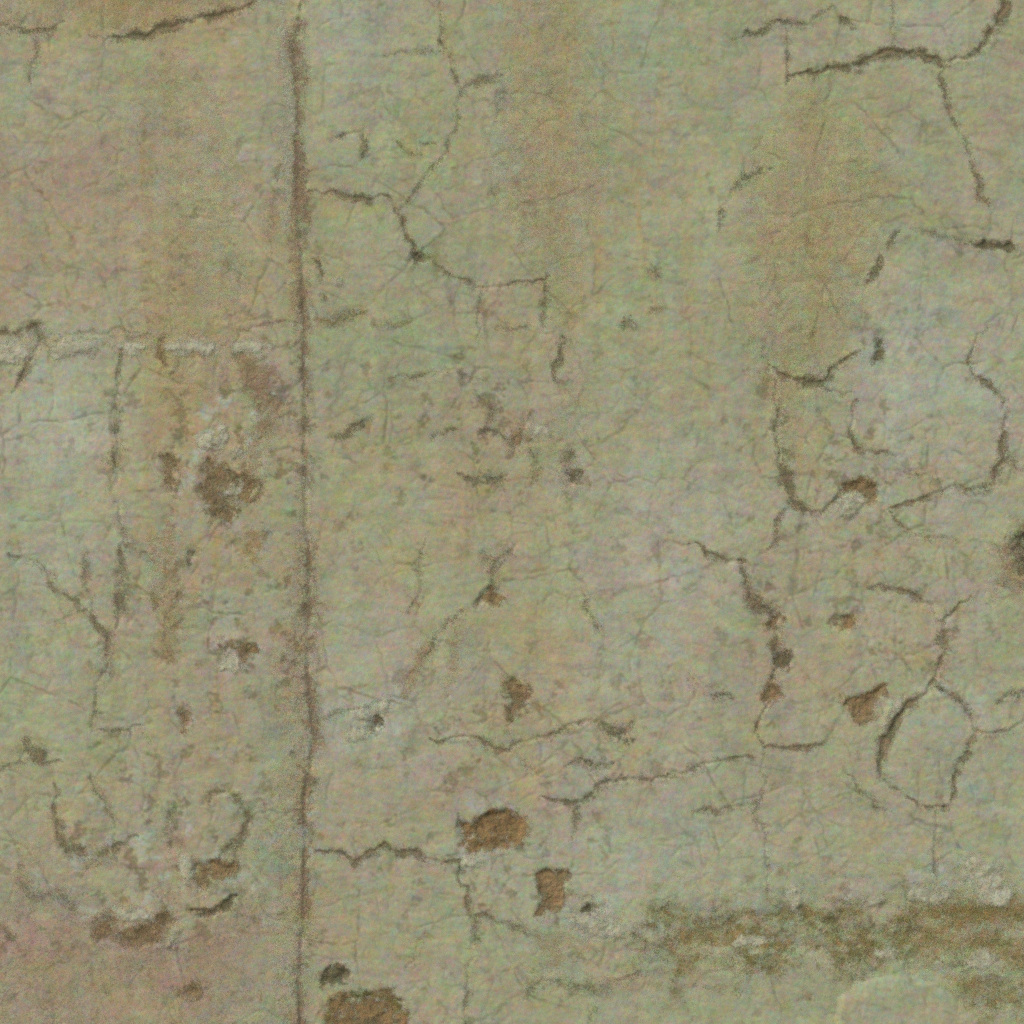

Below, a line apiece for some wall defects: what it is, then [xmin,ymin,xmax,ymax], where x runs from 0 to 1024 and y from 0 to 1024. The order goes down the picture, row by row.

crack [731,0,1014,213]
spalling [153,420,262,530]
crack [90,0,569,1024]
crack [688,327,1024,680]
spalling [837,682,903,736]
crack [844,583,1024,879]
crack [1,736,181,869]
spalling [315,961,412,1024]
spalling [454,806,530,871]
spalling [530,866,636,941]
crack [430,709,835,891]
water stain [635,878,1024,1014]